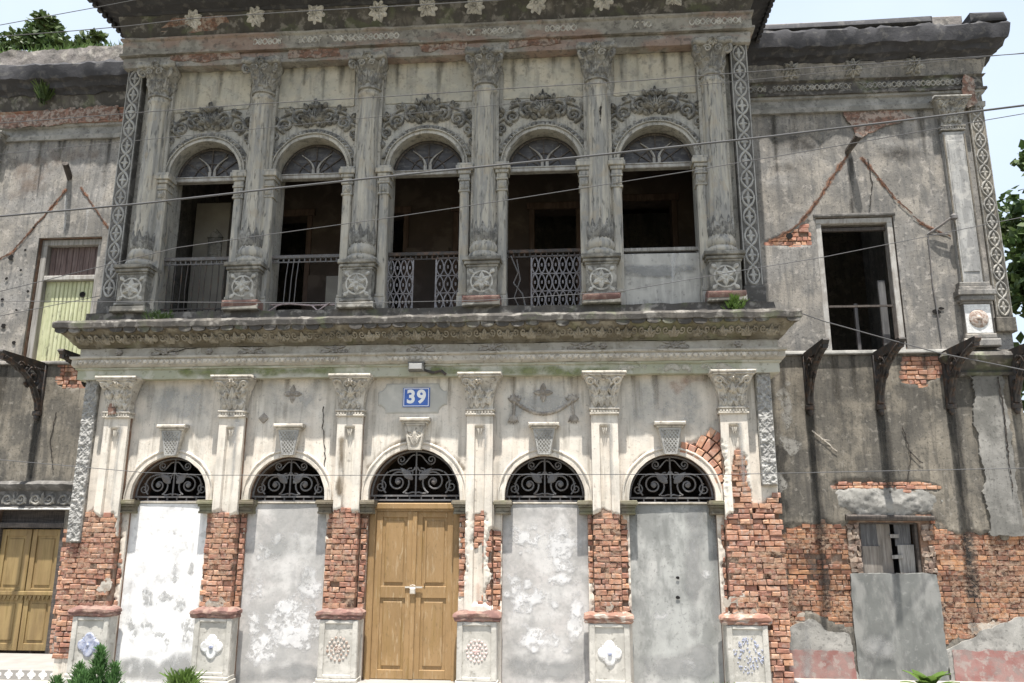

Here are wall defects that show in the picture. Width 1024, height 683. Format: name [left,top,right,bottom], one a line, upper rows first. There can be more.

flaking render [843,110,912,138]
flaking render [764,224,812,247]
flaking render [899,356,942,388]
flaking render [777,382,801,455]
flaking render [830,481,941,493]
flaking render [49,508,122,659]
flaking render [142,508,368,666]
flaking render [458,510,630,653]
flaking render [680,427,854,683]
flaking render [917,514,1024,644]
peeling [129,619,169,644]